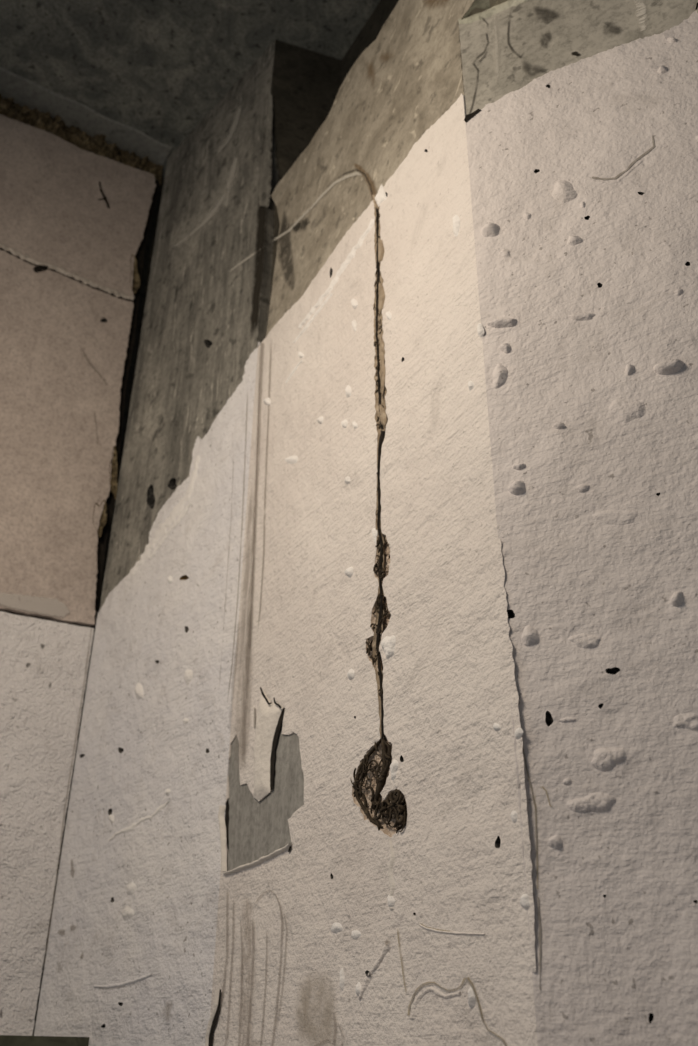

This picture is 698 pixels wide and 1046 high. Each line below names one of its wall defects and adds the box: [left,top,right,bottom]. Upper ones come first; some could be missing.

crack [93,180,160,624]
crack [372,194,388,739]
peeling [375,185,387,207]
peeling [218,687,304,875]